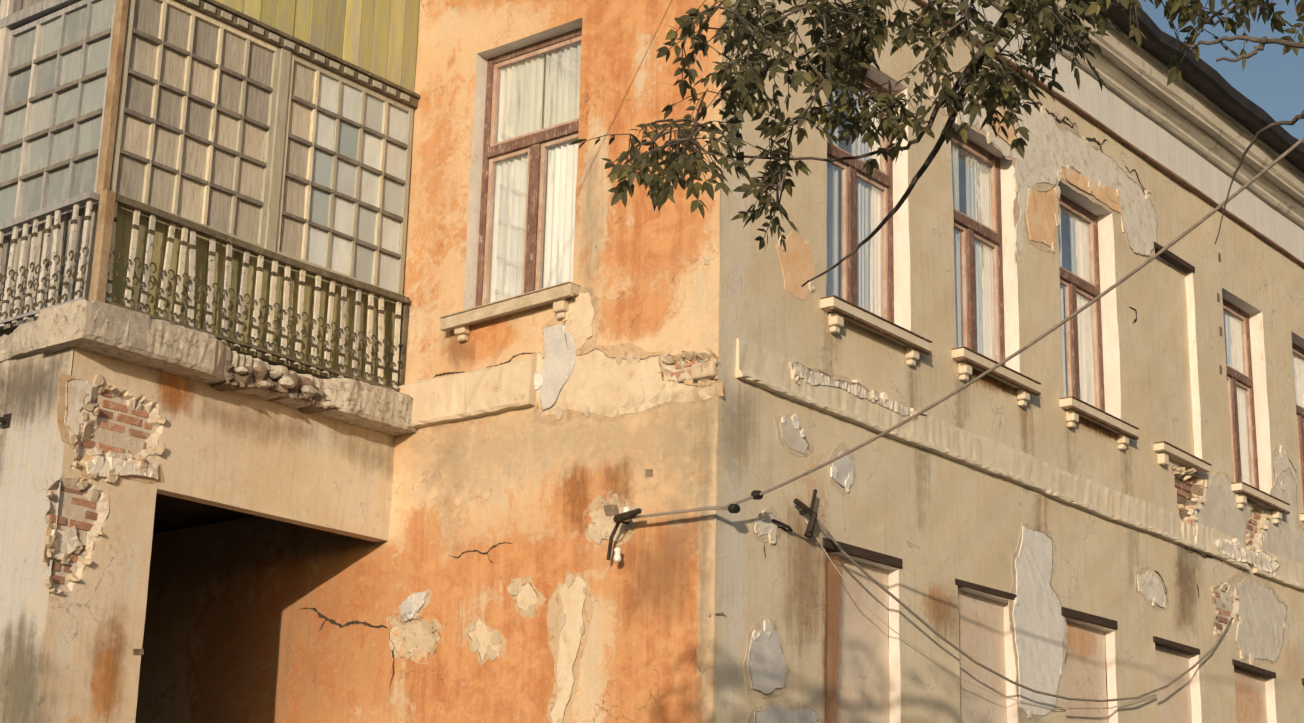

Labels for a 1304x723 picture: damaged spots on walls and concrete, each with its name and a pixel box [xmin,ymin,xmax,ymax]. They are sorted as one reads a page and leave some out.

peeling [928,68,1158,262]
flaking render [562,310,721,394]
flaking render [42,372,166,594]
spalling [1172,467,1211,535]
crack [450,542,512,563]
peeling [1197,445,1299,665]
damp [0,624,42,723]
crack [300,608,394,685]
spalling [385,610,443,665]
peeling [463,614,508,667]
peeling [507,571,593,723]
peeling [1008,523,1068,722]